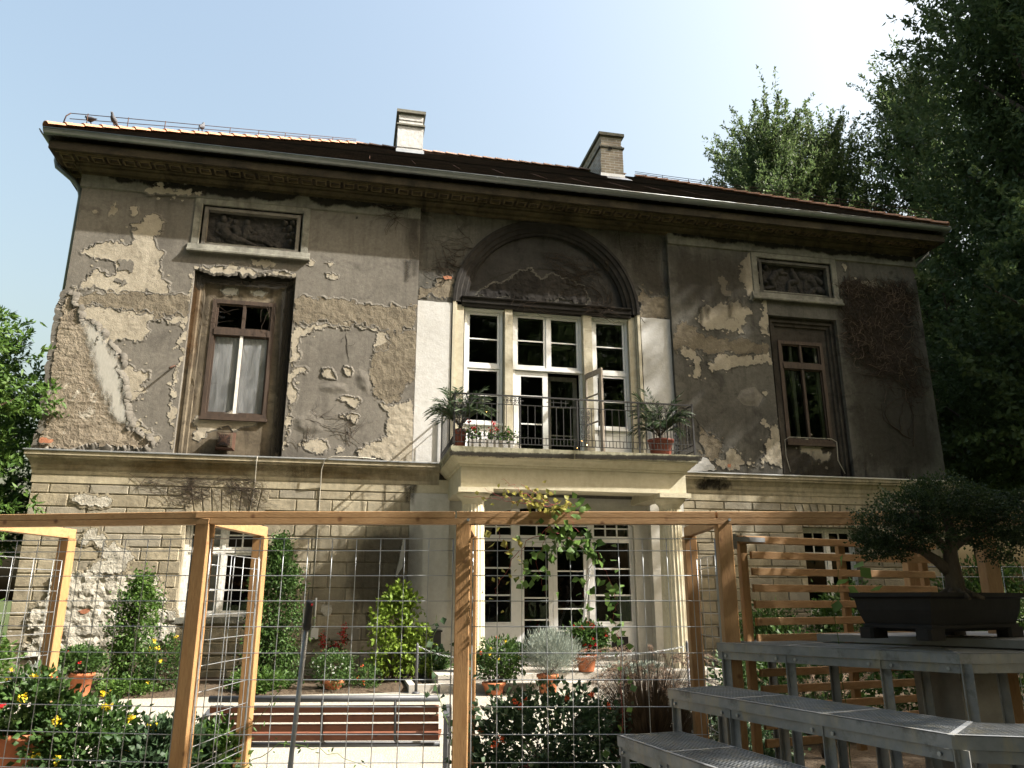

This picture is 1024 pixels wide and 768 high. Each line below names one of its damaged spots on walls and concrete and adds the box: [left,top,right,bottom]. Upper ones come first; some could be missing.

spalling [31,181,296,452]
peeling [307,258,340,281]
spalling [475,267,591,305]
spalling [282,274,456,461]
peeling [697,416,783,472]
spalling [69,491,114,510]
spalling [21,573,53,661]
spalling [60,526,180,661]